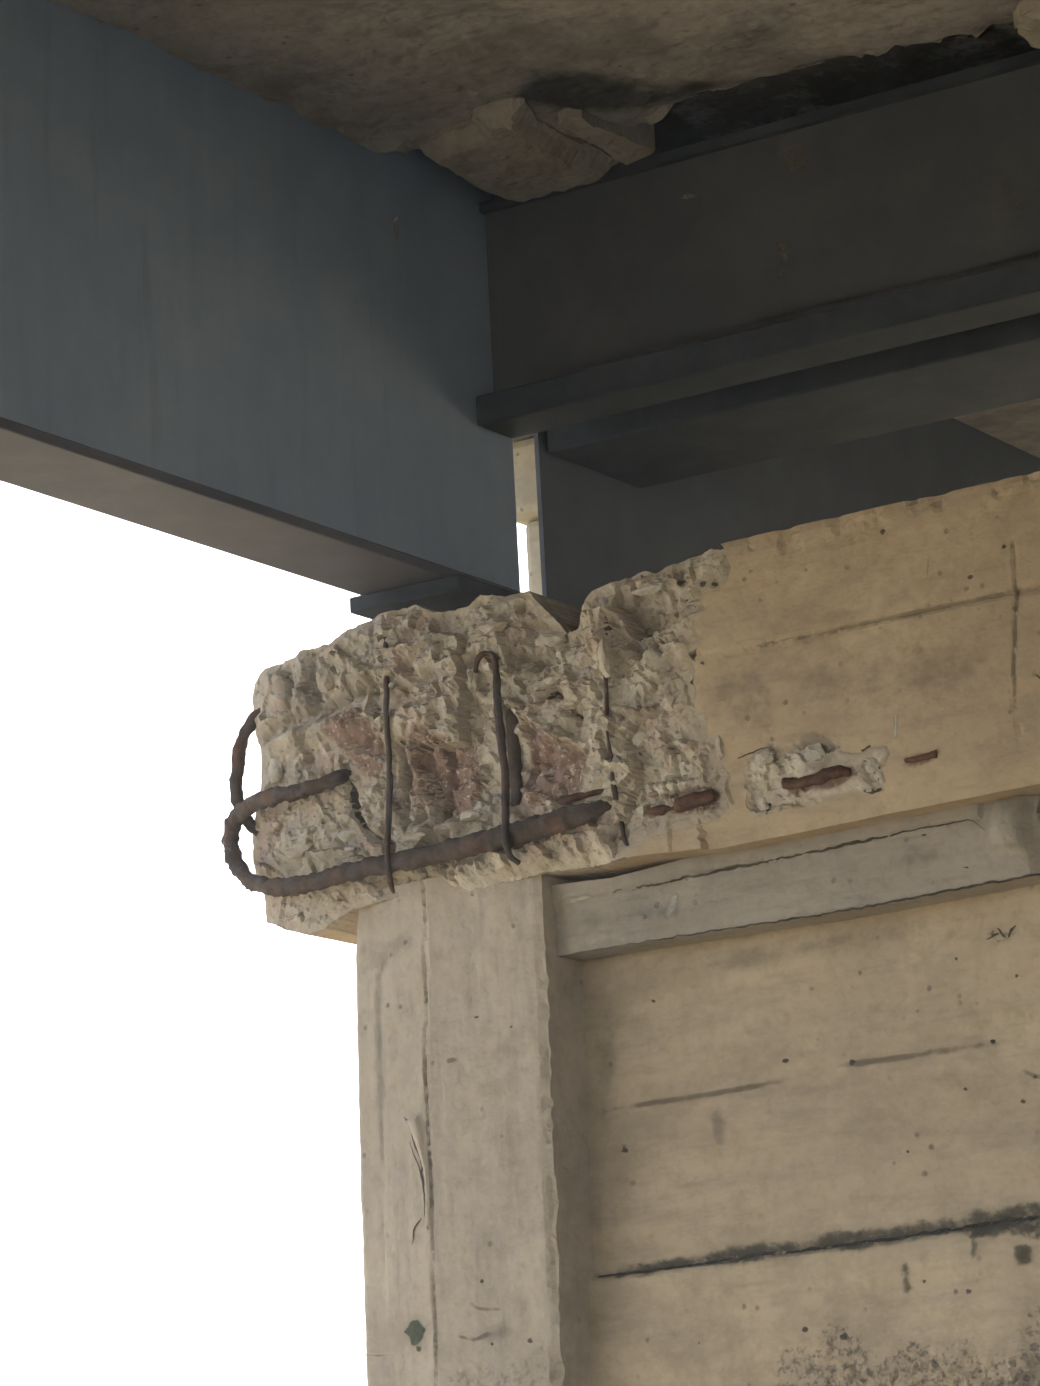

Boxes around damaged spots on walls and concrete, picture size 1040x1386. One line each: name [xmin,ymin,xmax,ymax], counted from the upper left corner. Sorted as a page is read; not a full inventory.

spalling [415,95,655,202]
corrosion [323,709,384,775]
corrosion [406,726,482,815]
corrosion [525,722,586,801]
spalling [221,549,937,942]
crack [598,1216,1040,1278]